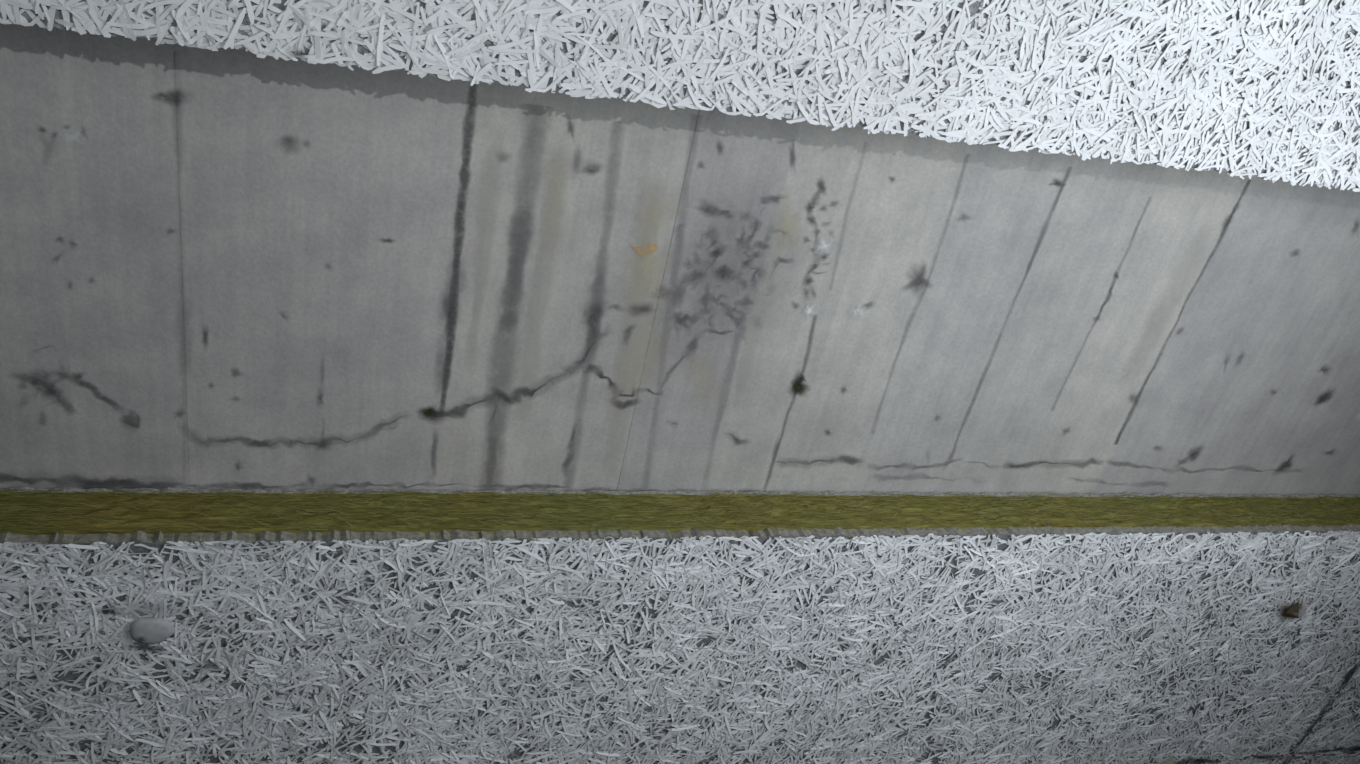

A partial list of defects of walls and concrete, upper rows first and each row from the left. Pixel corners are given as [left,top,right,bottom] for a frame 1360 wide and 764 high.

water stain [442,94,474,405]
crack [83,384,139,426]
crack [439,386,542,416]
crack [583,349,651,408]